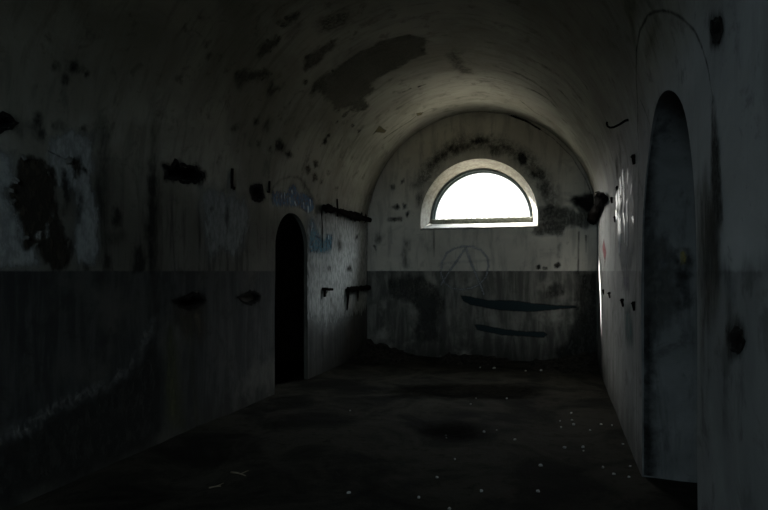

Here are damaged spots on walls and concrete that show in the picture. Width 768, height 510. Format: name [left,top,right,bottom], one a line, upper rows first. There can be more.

peeling [303,34,427,122]
spalling [162,158,206,184]